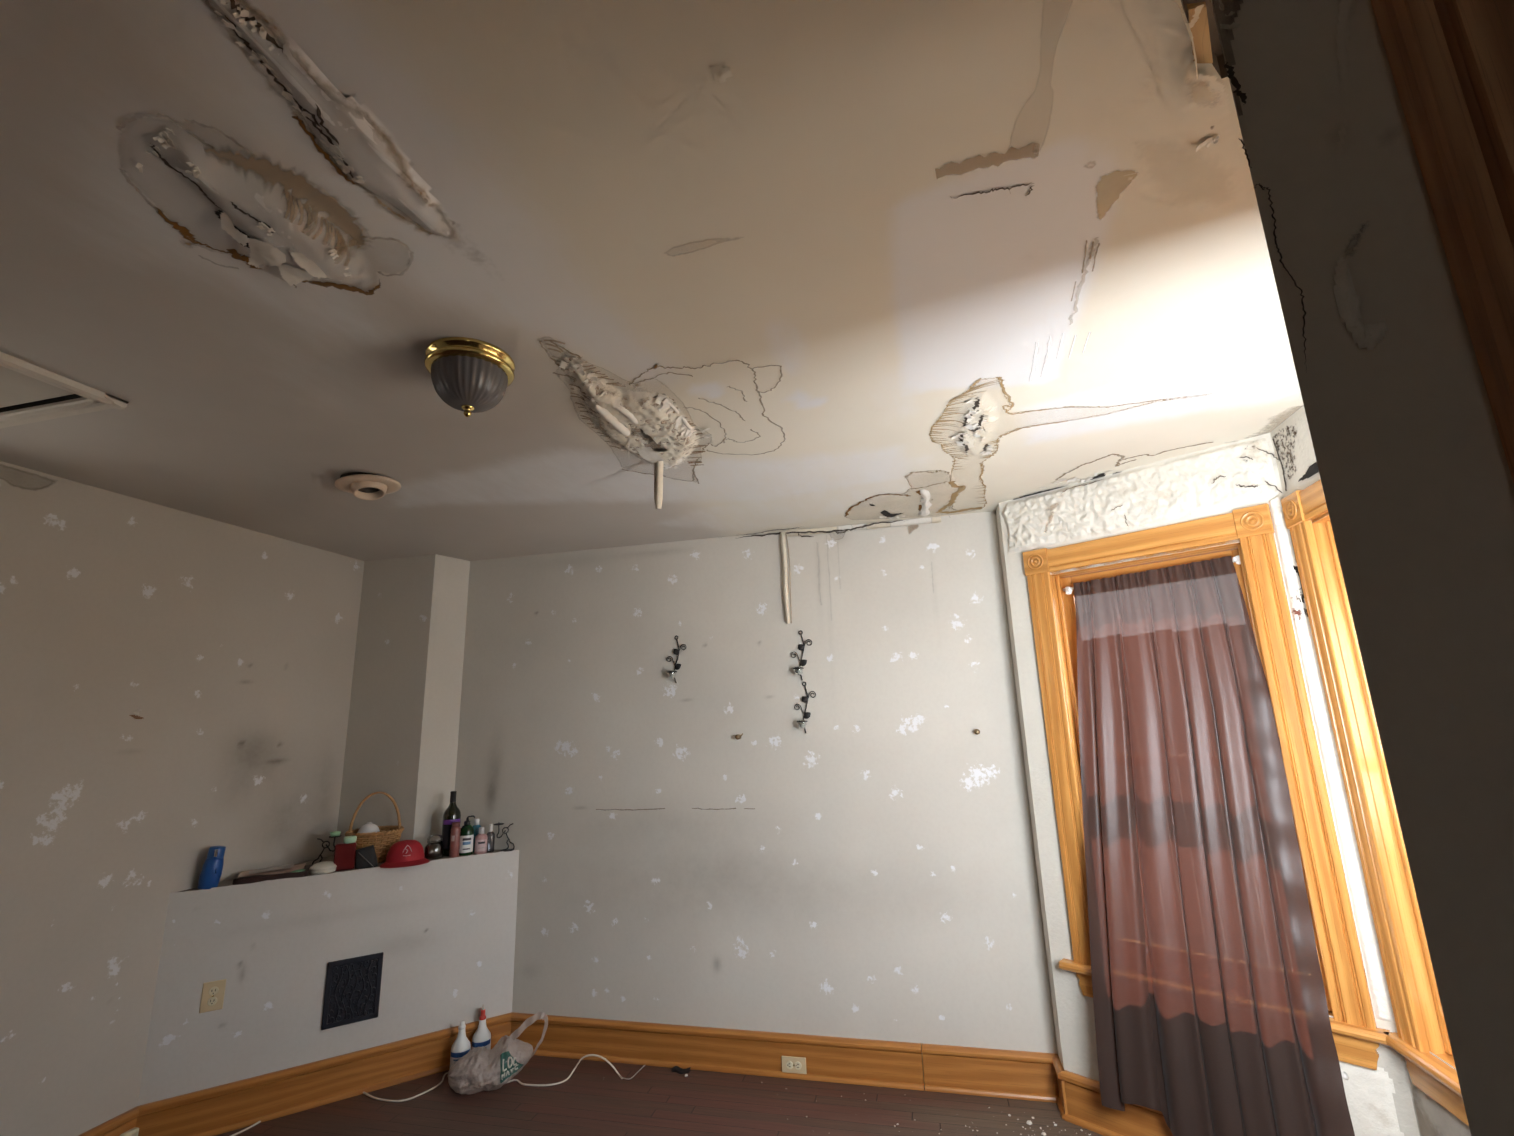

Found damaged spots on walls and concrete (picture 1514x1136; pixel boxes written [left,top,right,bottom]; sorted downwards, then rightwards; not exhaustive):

flaking render [1212,0,1247,116]
crack [1238,138,1307,373]
peeling [559,357,712,444]
flaking render [869,489,933,519]